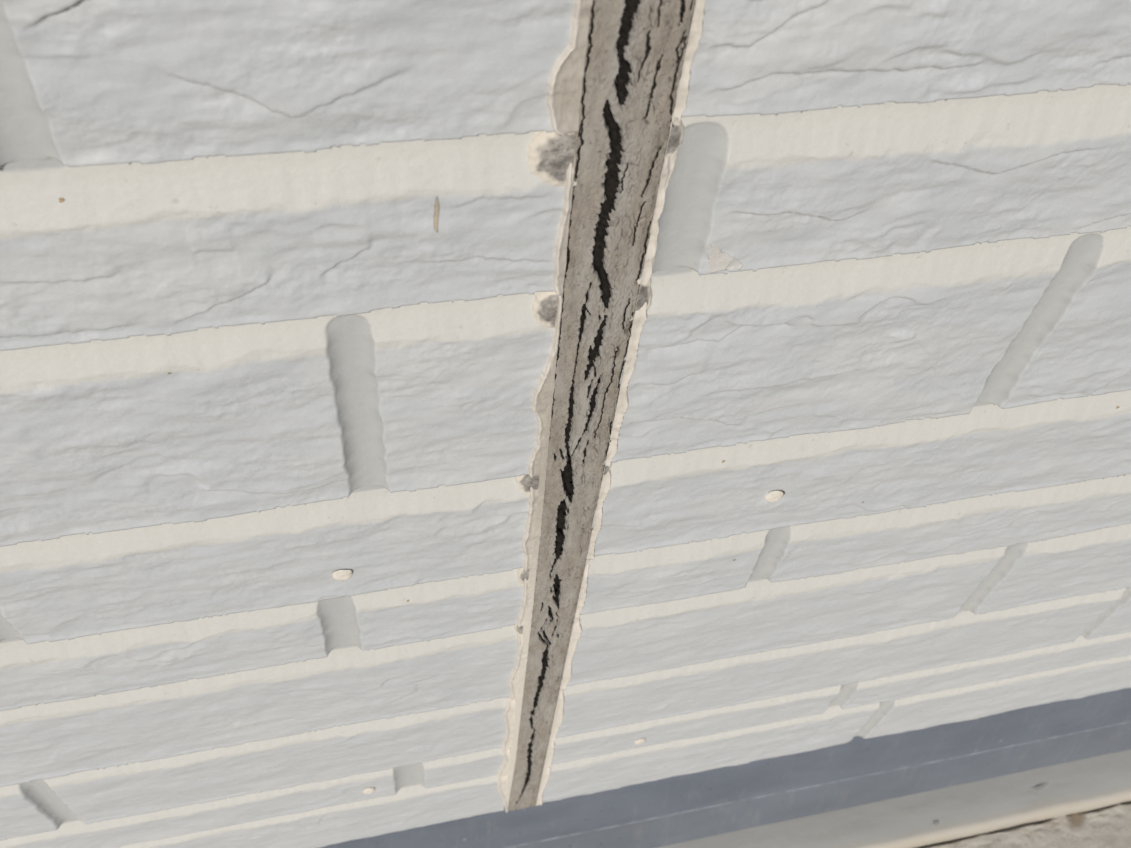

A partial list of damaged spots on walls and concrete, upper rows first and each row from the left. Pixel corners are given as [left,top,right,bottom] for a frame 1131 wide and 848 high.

crack [516,0,693,804]